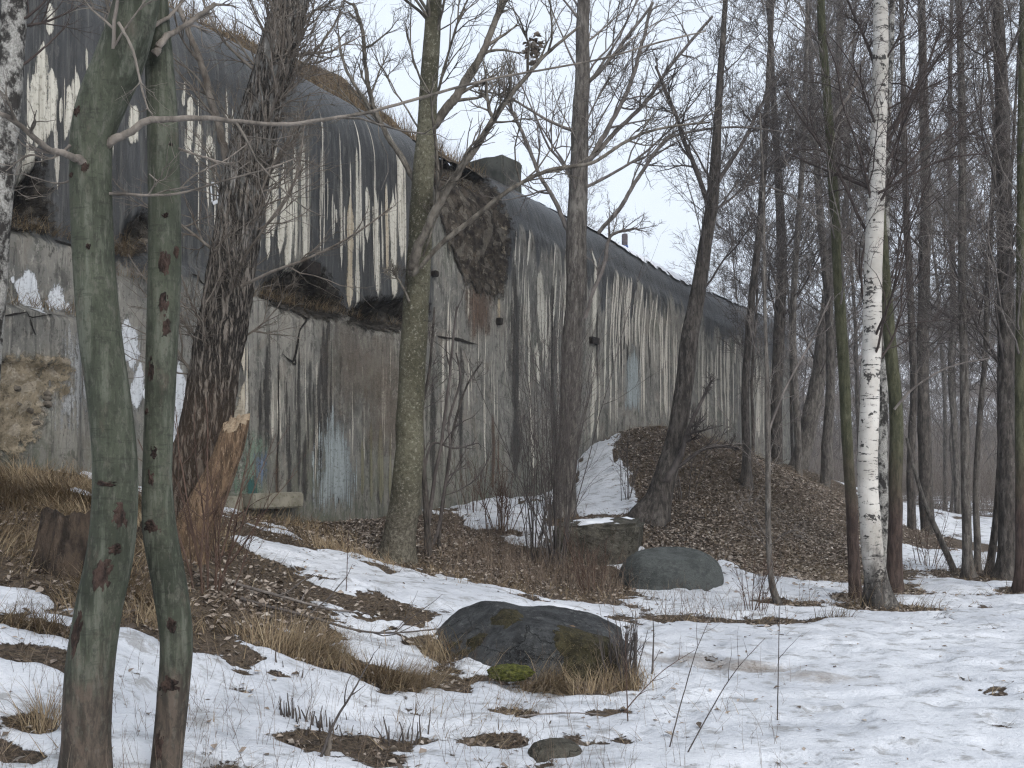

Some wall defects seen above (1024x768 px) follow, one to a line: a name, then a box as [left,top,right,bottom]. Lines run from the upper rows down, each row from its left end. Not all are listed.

water stain [14,3,88,190]
water stain [128,106,140,143]
water stain [182,82,234,225]
water stain [260,114,406,307]
spalling [434,156,517,302]
spalling [0,269,88,459]
water stain [234,318,392,515]
water stain [430,226,566,476]
water stain [589,251,683,439]
water stain [690,339,786,438]